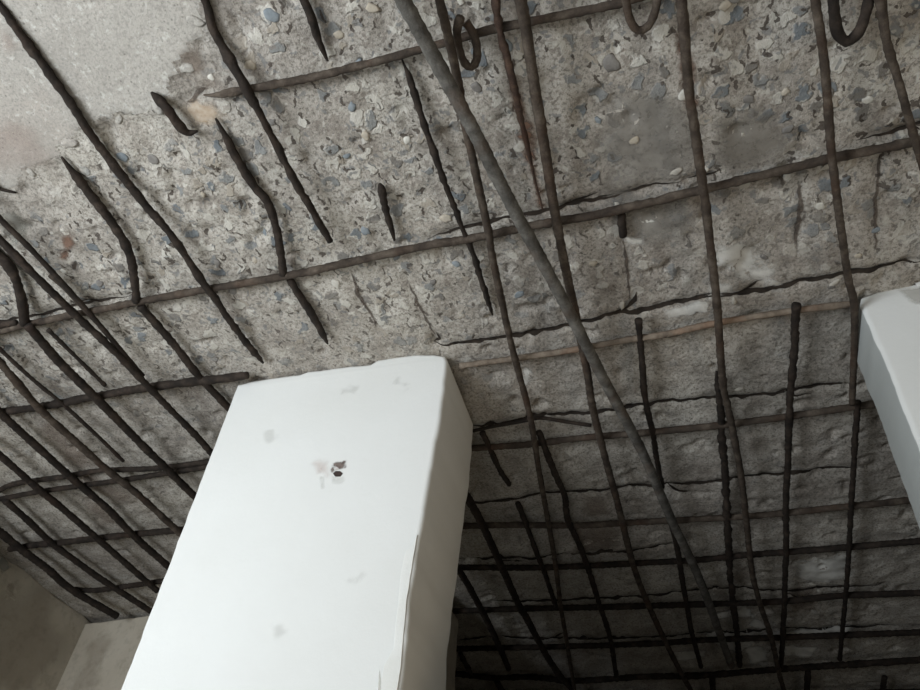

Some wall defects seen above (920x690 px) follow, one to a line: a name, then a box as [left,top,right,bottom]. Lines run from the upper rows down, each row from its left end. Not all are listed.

corrosion [188,101,217,122]
corrosion [60,235,74,259]
crack [434,259,920,346]
spalling [0,306,210,623]
spalling [158,385,227,449]
spalling [534,317,704,690]
crack [474,382,849,427]
crack [475,466,850,504]
spalling [643,320,737,559]
spalling [781,399,920,690]
crack [495,582,881,602]
crack [459,624,895,642]